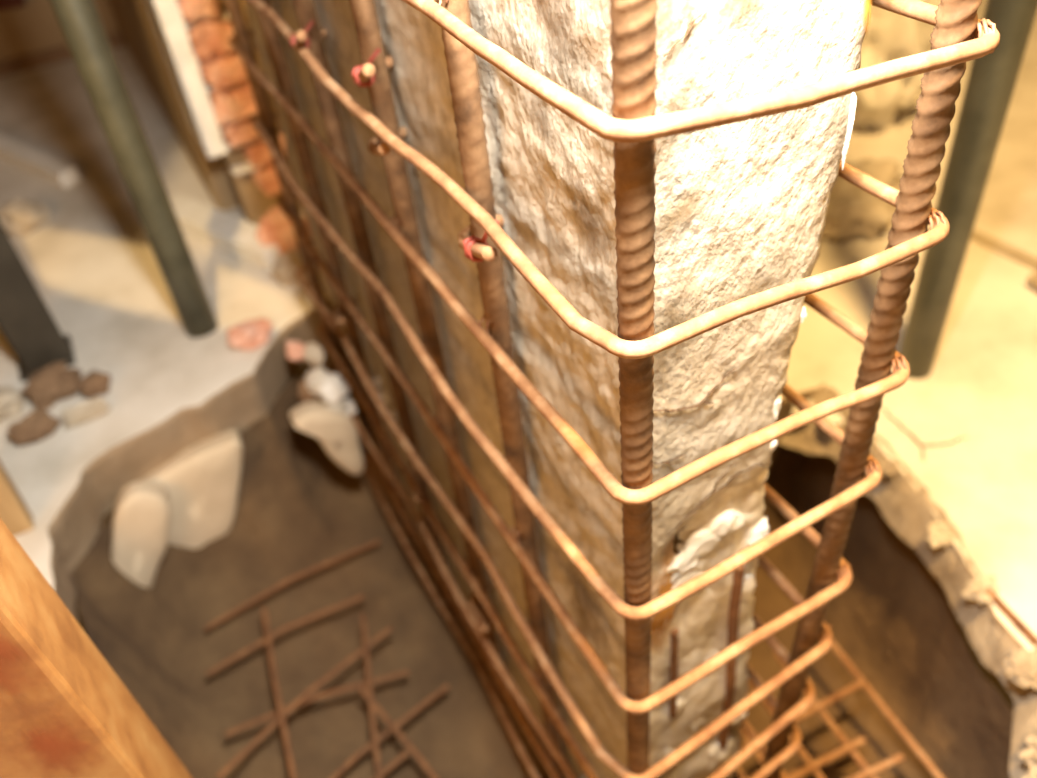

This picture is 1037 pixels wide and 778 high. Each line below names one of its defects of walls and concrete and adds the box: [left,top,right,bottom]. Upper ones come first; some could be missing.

spalling [177,0,413,540]
spalling [293,0,457,617]
spalling [349,0,508,707]
spalling [469,216,566,778]
spalling [610,0,658,120]
spalling [613,139,657,341]
spalling [618,355,654,490]
spalling [622,502,769,606]
spalling [669,392,1037,778]
spalling [854,254,919,391]
spalling [885,62,966,250]
spalling [624,617,675,774]